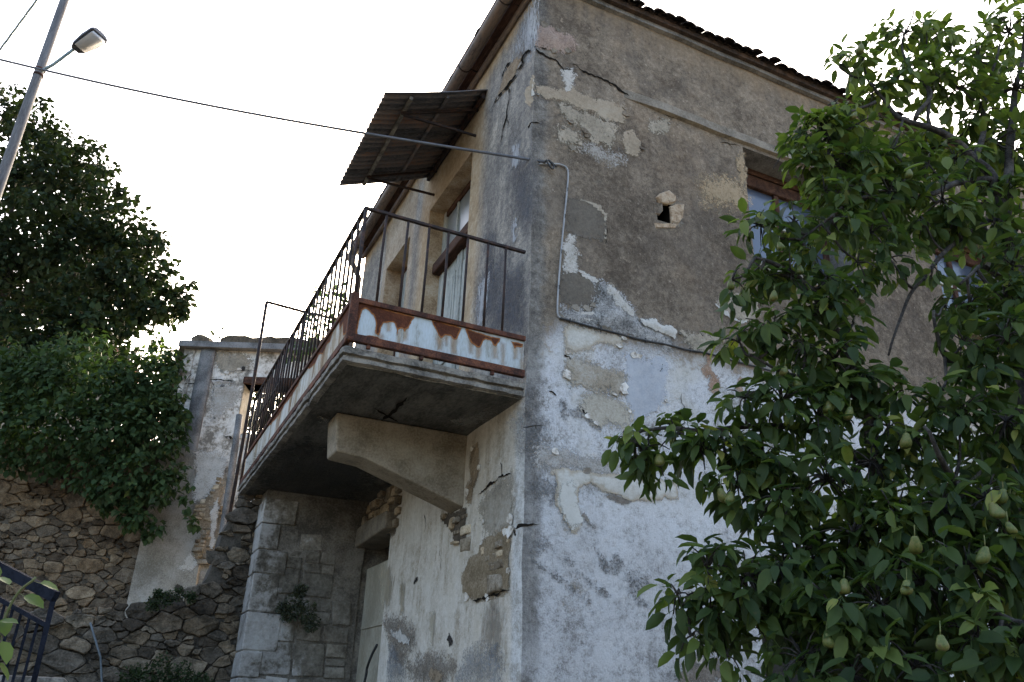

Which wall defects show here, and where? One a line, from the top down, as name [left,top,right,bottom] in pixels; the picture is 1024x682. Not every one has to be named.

crack [492,46,629,142]
peeling [524,75,673,156]
spalling [653,190,684,228]
rust [308,303,414,369]
rust [432,320,523,348]
spalling [559,276,723,436]
crack [376,398,407,423]
spalling [361,485,402,539]
spalling [440,443,516,603]
crack [478,462,510,495]
water stain [602,493,630,505]
water stain [531,543,650,615]